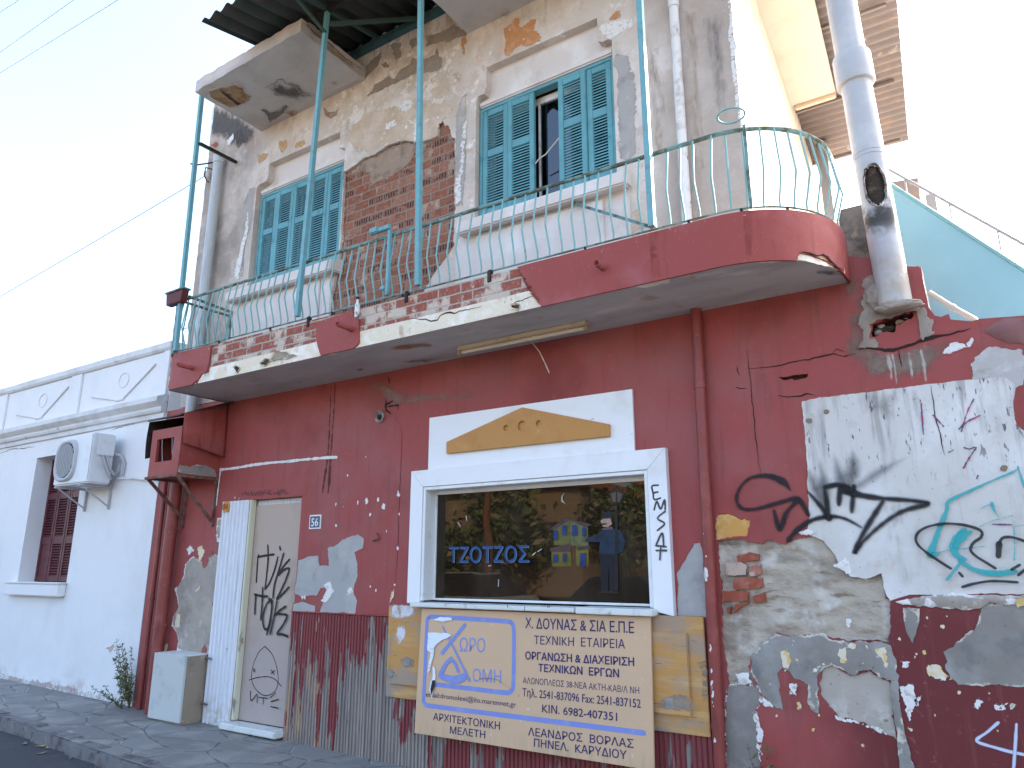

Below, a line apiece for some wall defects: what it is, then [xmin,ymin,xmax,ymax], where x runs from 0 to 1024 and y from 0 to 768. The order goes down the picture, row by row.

peeling [504,18,541,56]
spalling [208,83,252,108]
water stain [211,111,253,147]
spalling [331,23,468,315]
peeling [613,54,637,160]
peeling [235,187,255,280]
crack [798,251,844,271]
hole [873,318,912,337]
crack [736,328,970,473]
flaking render [164,517,221,653]
flaking render [292,533,365,614]
peeling [675,335,1024,768]